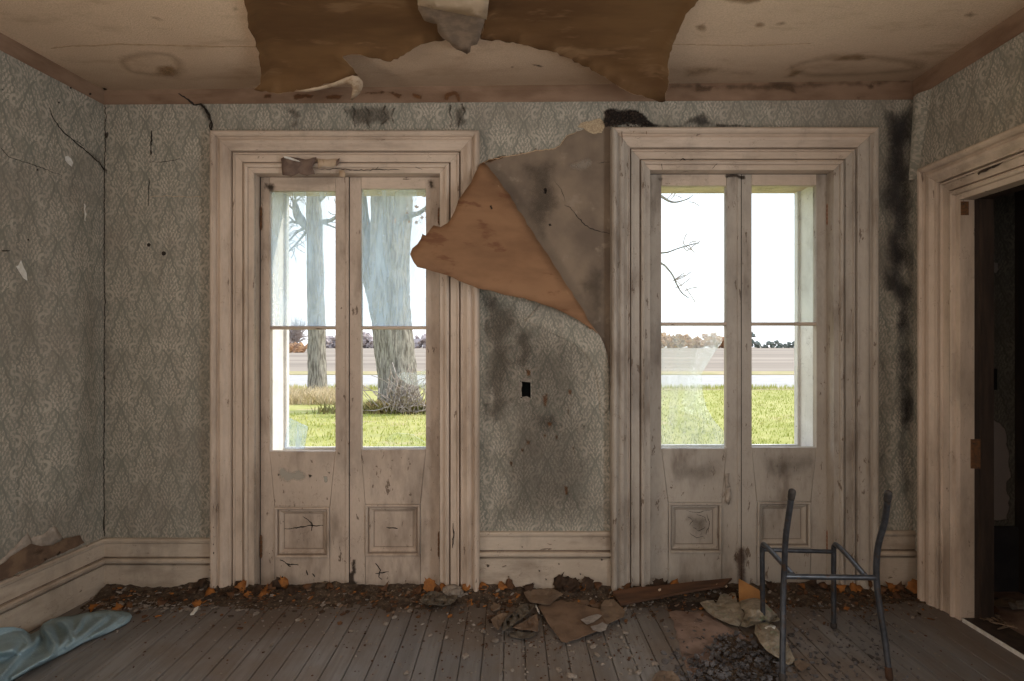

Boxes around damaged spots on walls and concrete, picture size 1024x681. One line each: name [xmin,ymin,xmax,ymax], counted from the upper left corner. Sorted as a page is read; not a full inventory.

crack [49,108,104,170]
crack [178,93,213,130]
leakage [352,106,395,124]
leakage [603,109,669,146]
leakage [884,112,911,329]
flaking render [410,118,610,418]